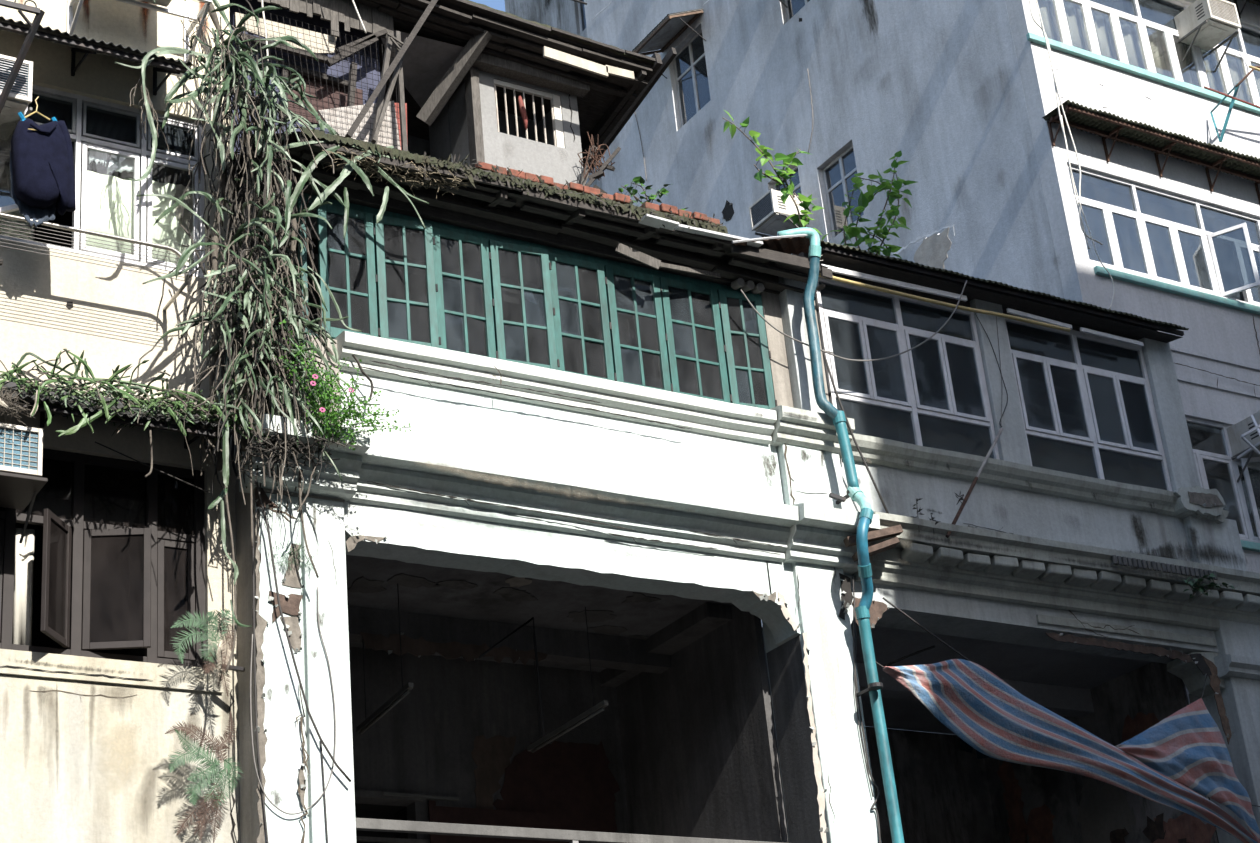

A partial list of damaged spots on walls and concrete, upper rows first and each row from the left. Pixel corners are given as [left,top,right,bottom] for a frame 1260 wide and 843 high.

water stain [864,0,876,29]
peeling [913,227,952,269]
peeling [255,487,304,843]
peeling [753,591,829,843]
spalling [1045,632,1234,744]